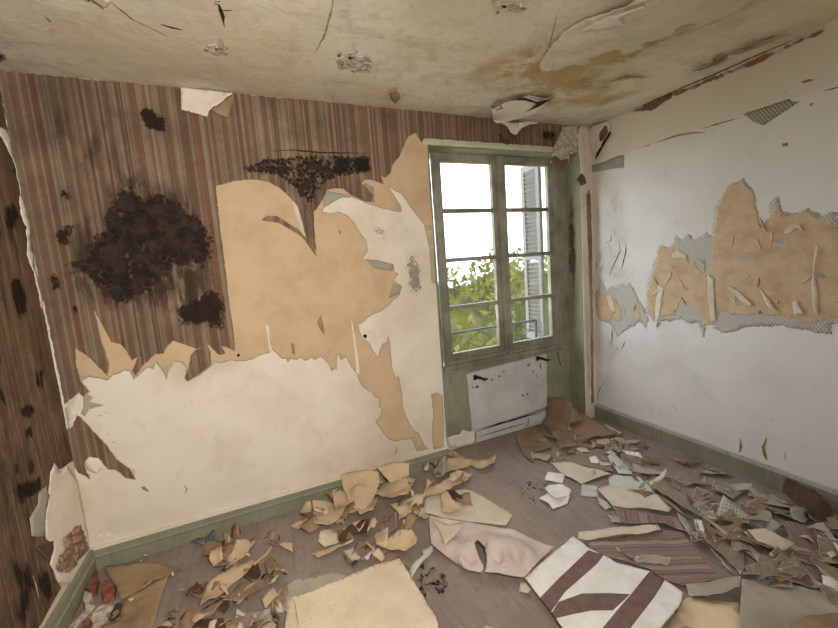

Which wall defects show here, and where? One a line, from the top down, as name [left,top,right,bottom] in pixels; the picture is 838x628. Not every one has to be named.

crack [315,0,333,53]
leakage [522,40,655,104]
leakage [695,35,776,71]
leakage [244,153,372,212]
leakage [56,225,74,245]
leakage [65,179,226,330]
peeling [586,178,838,403]
peeling [65,393,81,428]
leakage [14,460,41,504]
peeling [85,457,104,474]
flaking render [29,463,90,584]
leakage [14,563,52,619]